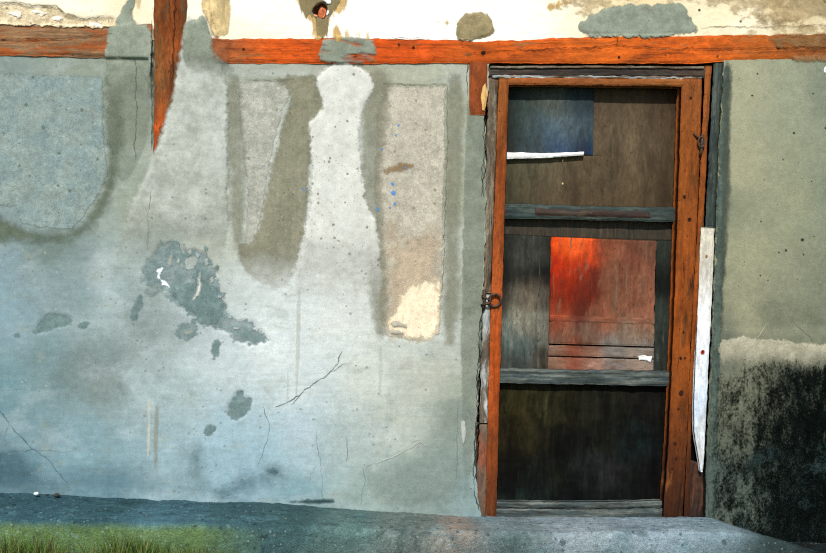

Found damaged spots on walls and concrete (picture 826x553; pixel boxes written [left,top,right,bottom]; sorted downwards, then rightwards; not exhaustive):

flaking render [0,3,116,28]
water stain [74,83,121,235]
water stain [227,75,323,267]
water stain [0,220,45,241]
flaking render [131,240,269,346]
flaking render [211,339,221,358]
flaking render [228,391,252,420]
crack [259,352,342,461]
water stain [713,336,826,543]